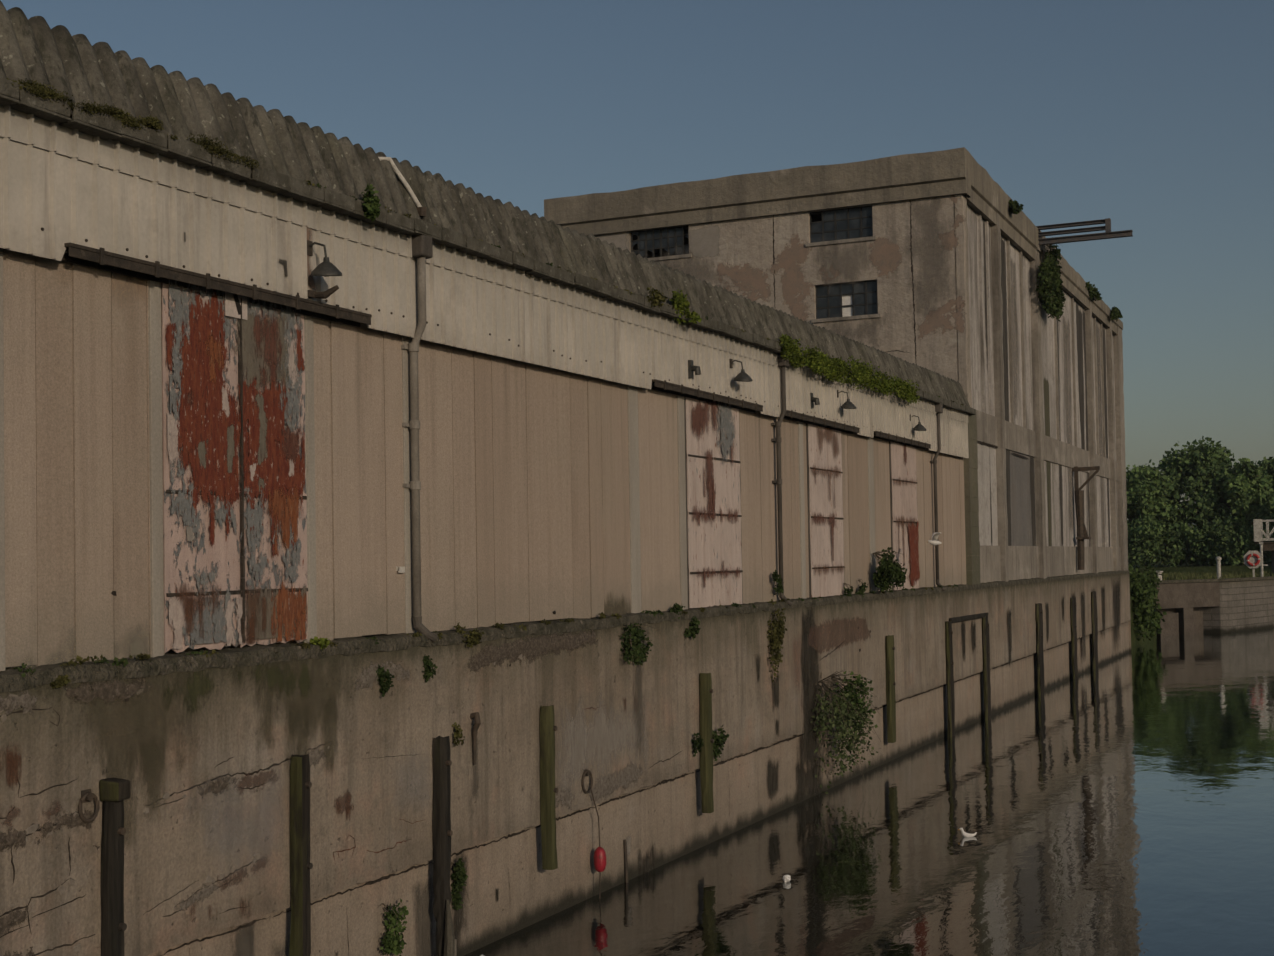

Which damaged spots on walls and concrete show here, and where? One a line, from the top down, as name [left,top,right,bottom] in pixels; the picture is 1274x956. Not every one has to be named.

peeling [166,280,307,649]
rust [176,289,305,557]
rust [693,450,738,526]
rust [812,426,843,575]
rust [180,585,221,633]
rust [247,581,308,644]
rust [698,561,740,588]
rust [896,516,920,586]
crack [872,622,1127,711]
crack [0,778,95,956]
crack [143,723,837,956]